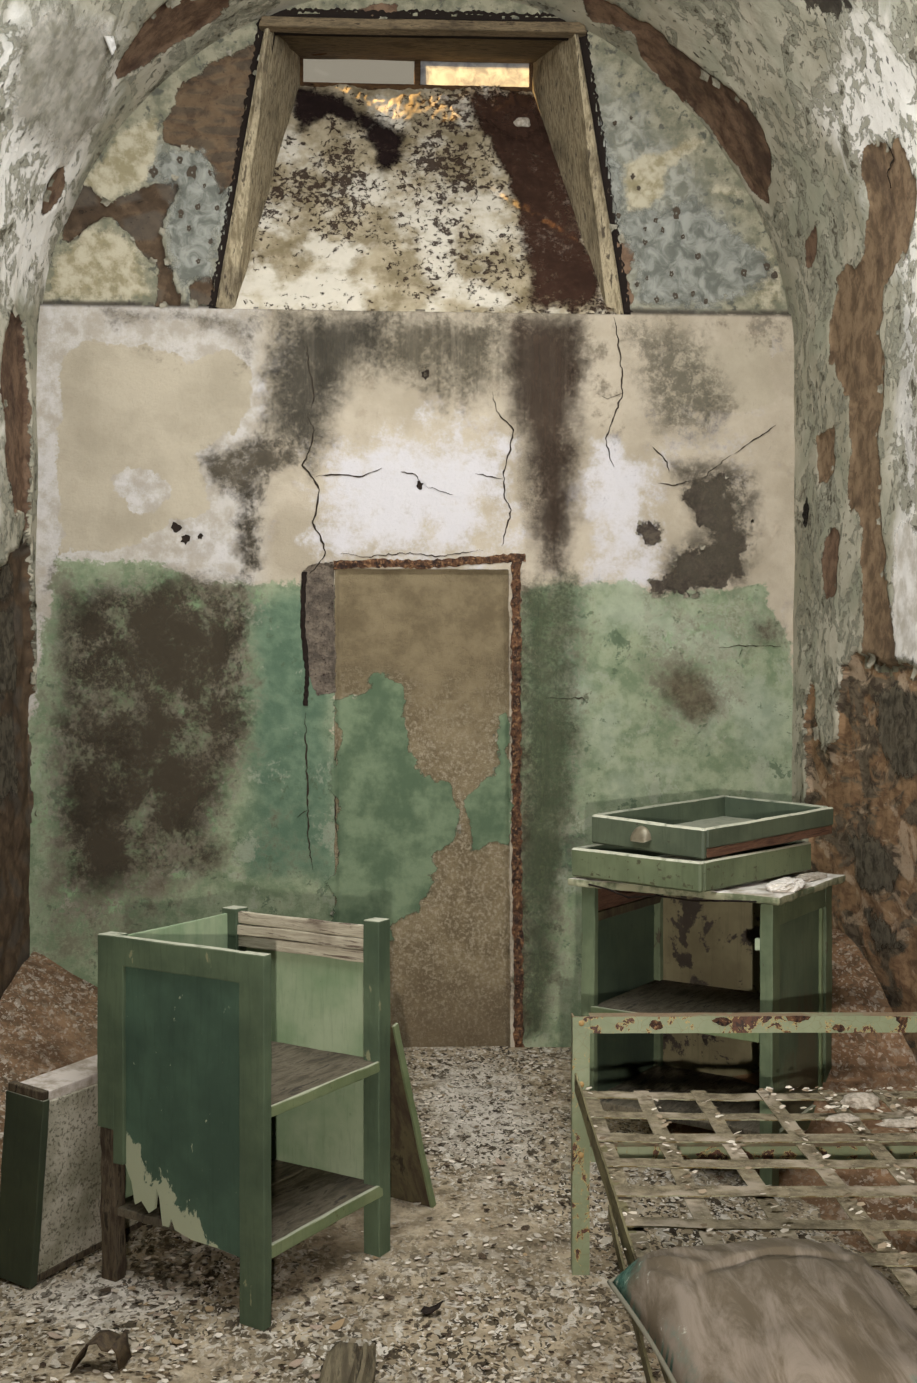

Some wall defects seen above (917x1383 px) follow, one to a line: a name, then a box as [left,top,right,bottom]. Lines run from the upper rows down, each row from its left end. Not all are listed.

flaking render [41,44,260,308]
flaking render [104,0,230,79]
flaking render [583,0,772,204]
flaking render [0,306,37,999]
mould [56,579,246,888]
leakage [203,314,582,1037]
crack [301,346,514,573]
peeling [325,672,514,941]
crack [602,319,623,466]
leakage [667,464,754,586]
crack [654,425,776,486]
flaking render [801,137,917,1012]